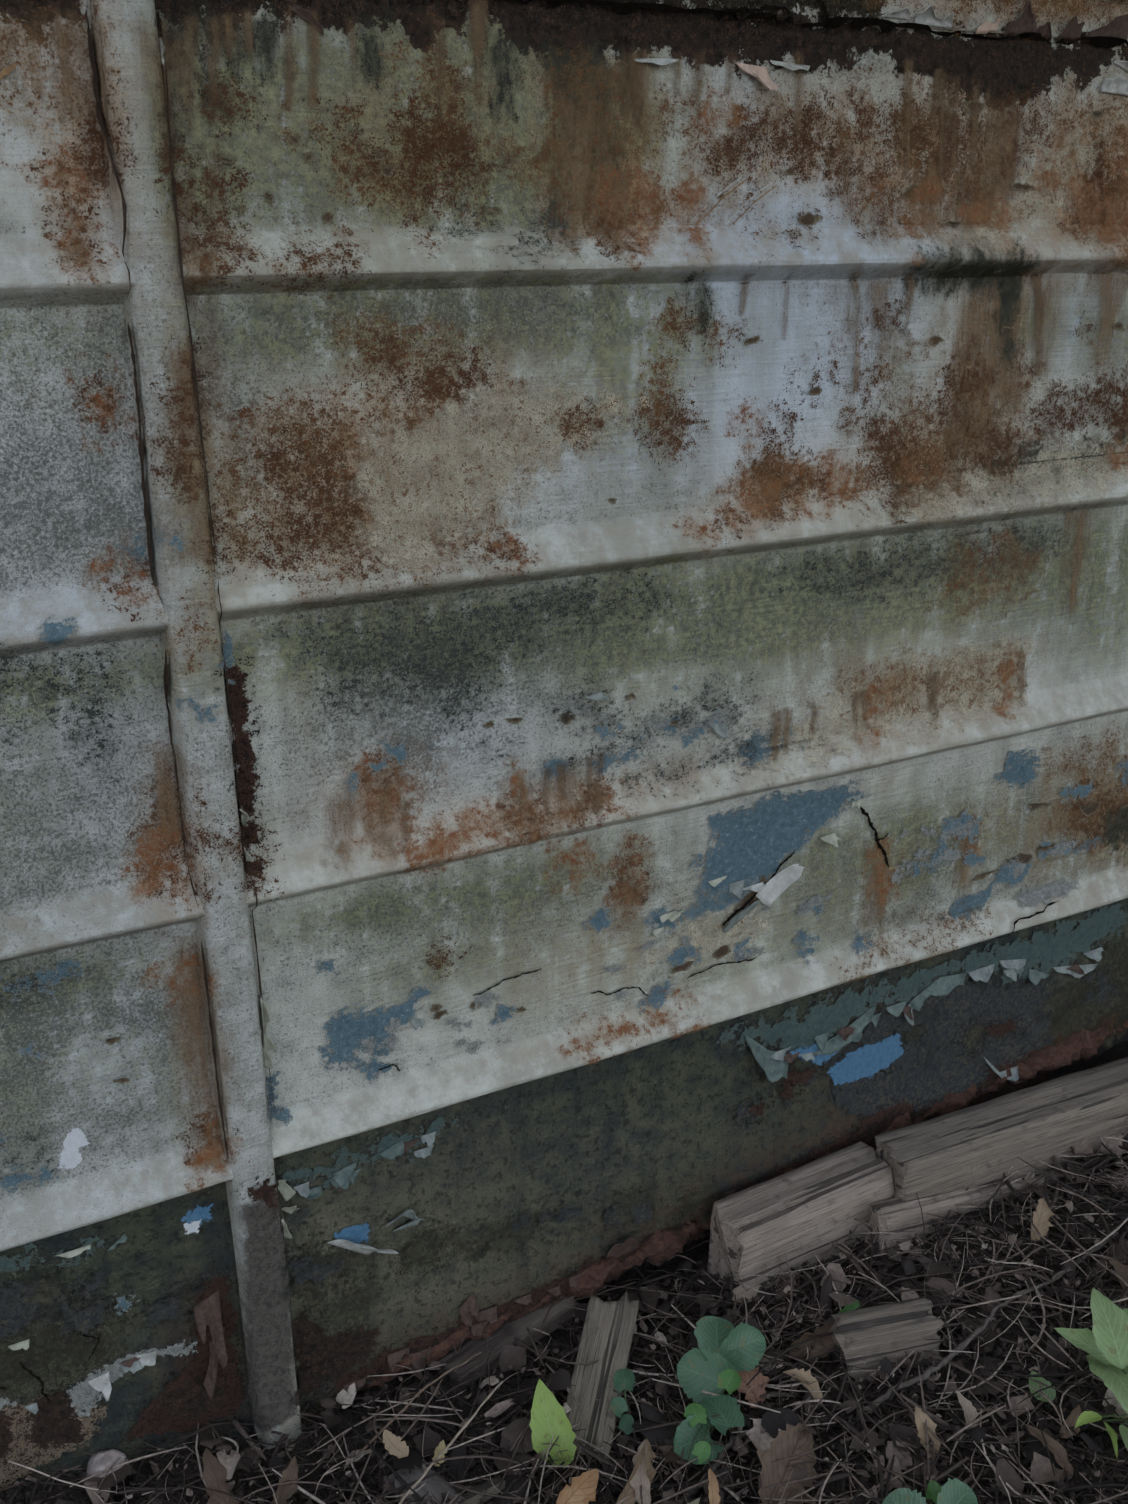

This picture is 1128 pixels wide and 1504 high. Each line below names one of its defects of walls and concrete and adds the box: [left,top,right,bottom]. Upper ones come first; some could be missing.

peeling [154,0,1128,254]
crack [500,0,1128,48]
leakage [675,270,715,338]
leakage [871,236,1039,365]
crack [156,5,279,1158]
rust [0,0,1128,933]
crack [856,794,889,867]
peeling [715,777,1128,1129]
peeling [276,1109,466,1412]
peeling [0,1290,228,1490]